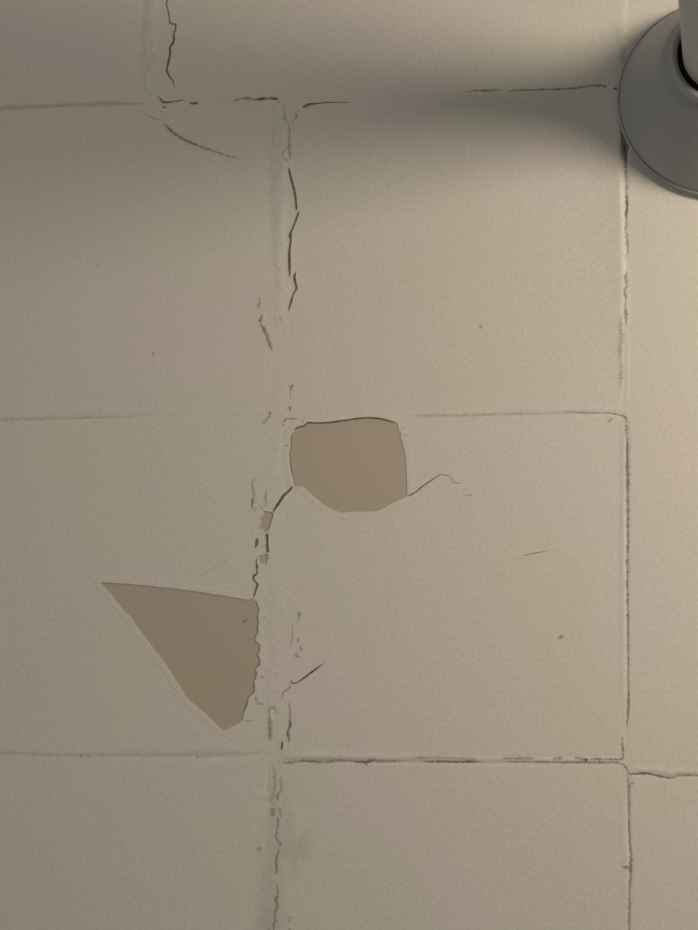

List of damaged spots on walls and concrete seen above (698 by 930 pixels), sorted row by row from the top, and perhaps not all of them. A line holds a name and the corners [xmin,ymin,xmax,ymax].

crack [154,0,198,108]
crack [236,95,278,103]
crack [302,101,353,109]
crack [469,84,617,92]
crack [286,167,301,312]
peeling [282,410,414,520]
crack [251,485,294,607]
peeling [95,576,267,737]